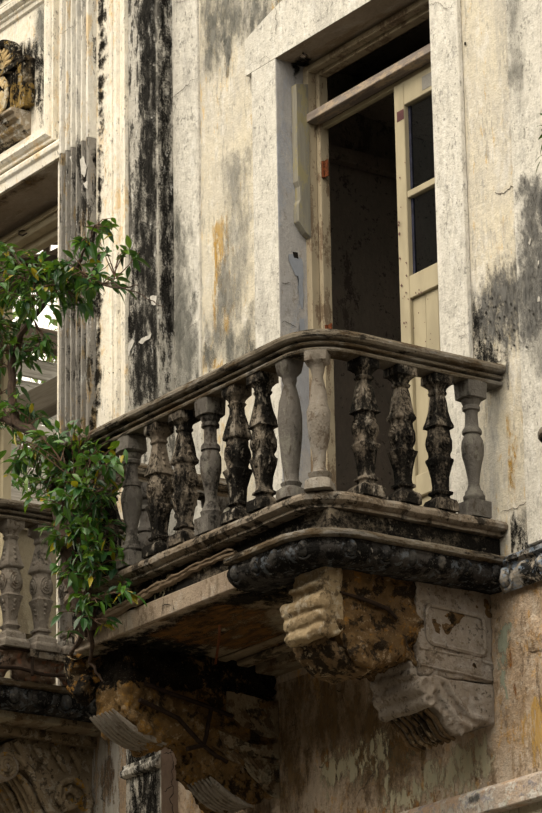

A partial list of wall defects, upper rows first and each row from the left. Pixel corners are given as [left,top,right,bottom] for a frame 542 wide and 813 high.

leakage [93,0,107,134]
leakage [200,0,281,77]
leakage [291,57,311,76]
leakage [89,145,103,265]
leakage [128,0,253,409]
leakage [472,175,542,389]
leakage [89,285,103,430]
leakage [103,756,114,796]
leakage [127,770,160,813]
peeling [315,728,495,813]